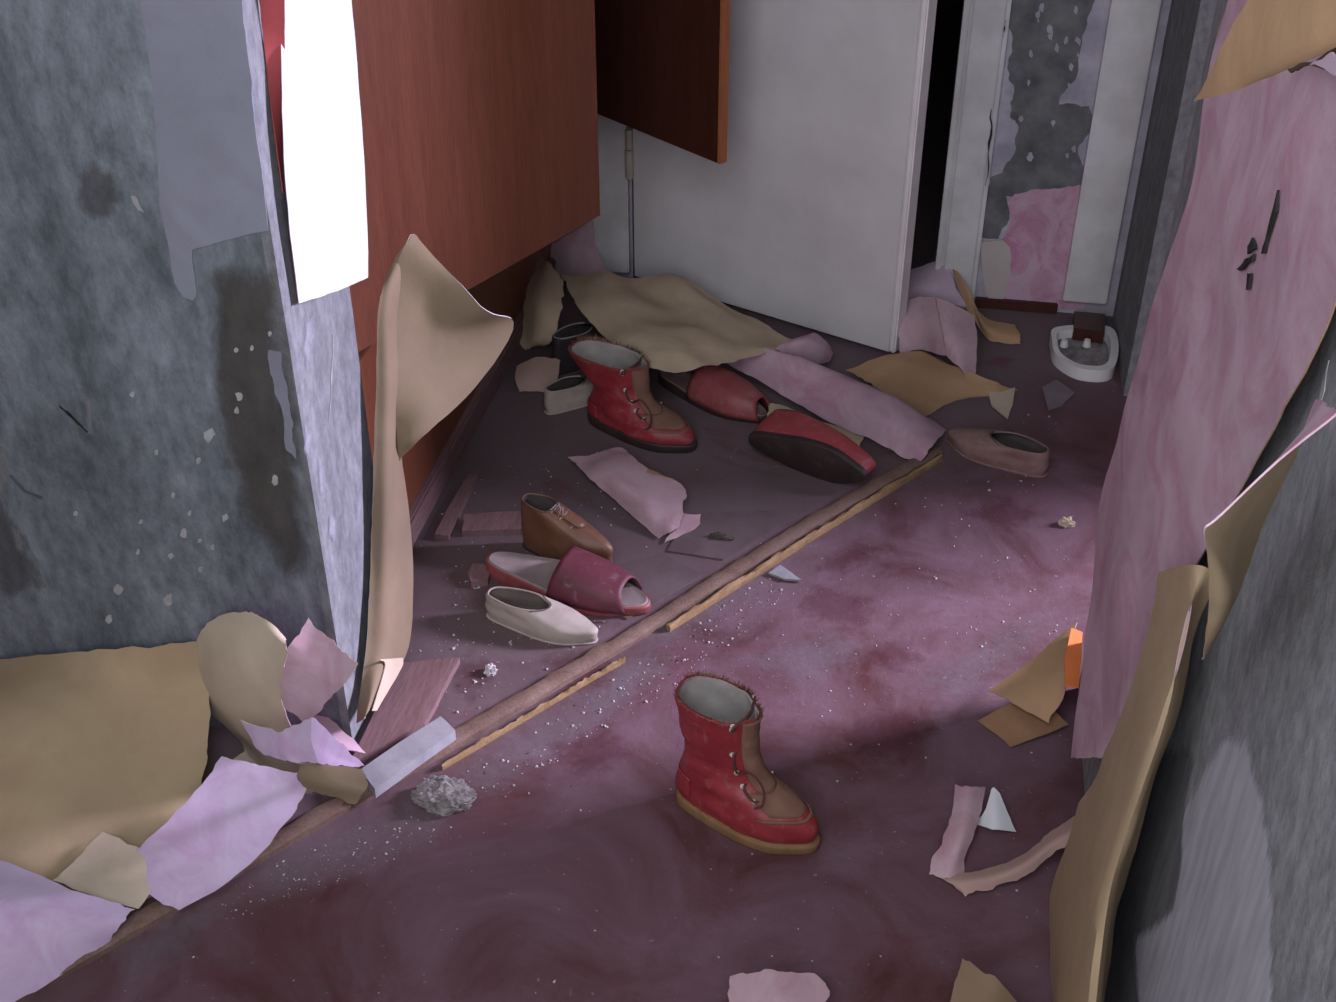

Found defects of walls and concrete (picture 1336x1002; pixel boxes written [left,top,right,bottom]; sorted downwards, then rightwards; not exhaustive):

spalling [982,0,1095,239]